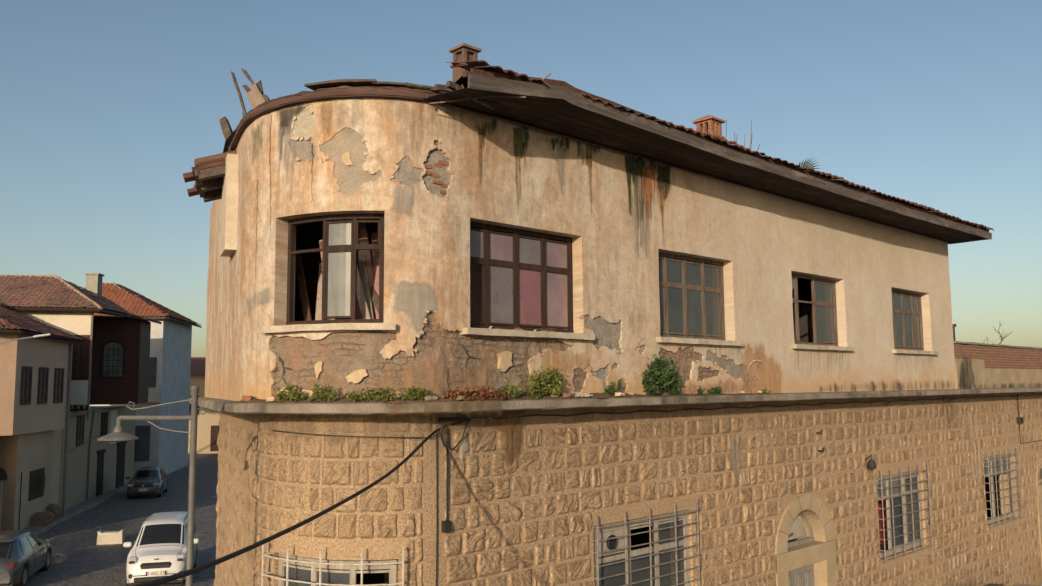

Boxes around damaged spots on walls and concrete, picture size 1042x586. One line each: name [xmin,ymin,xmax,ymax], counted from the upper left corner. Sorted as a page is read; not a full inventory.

flaking render [289,104,451,198]
flaking render [271,310,627,399]
flaking render [656,347,756,384]